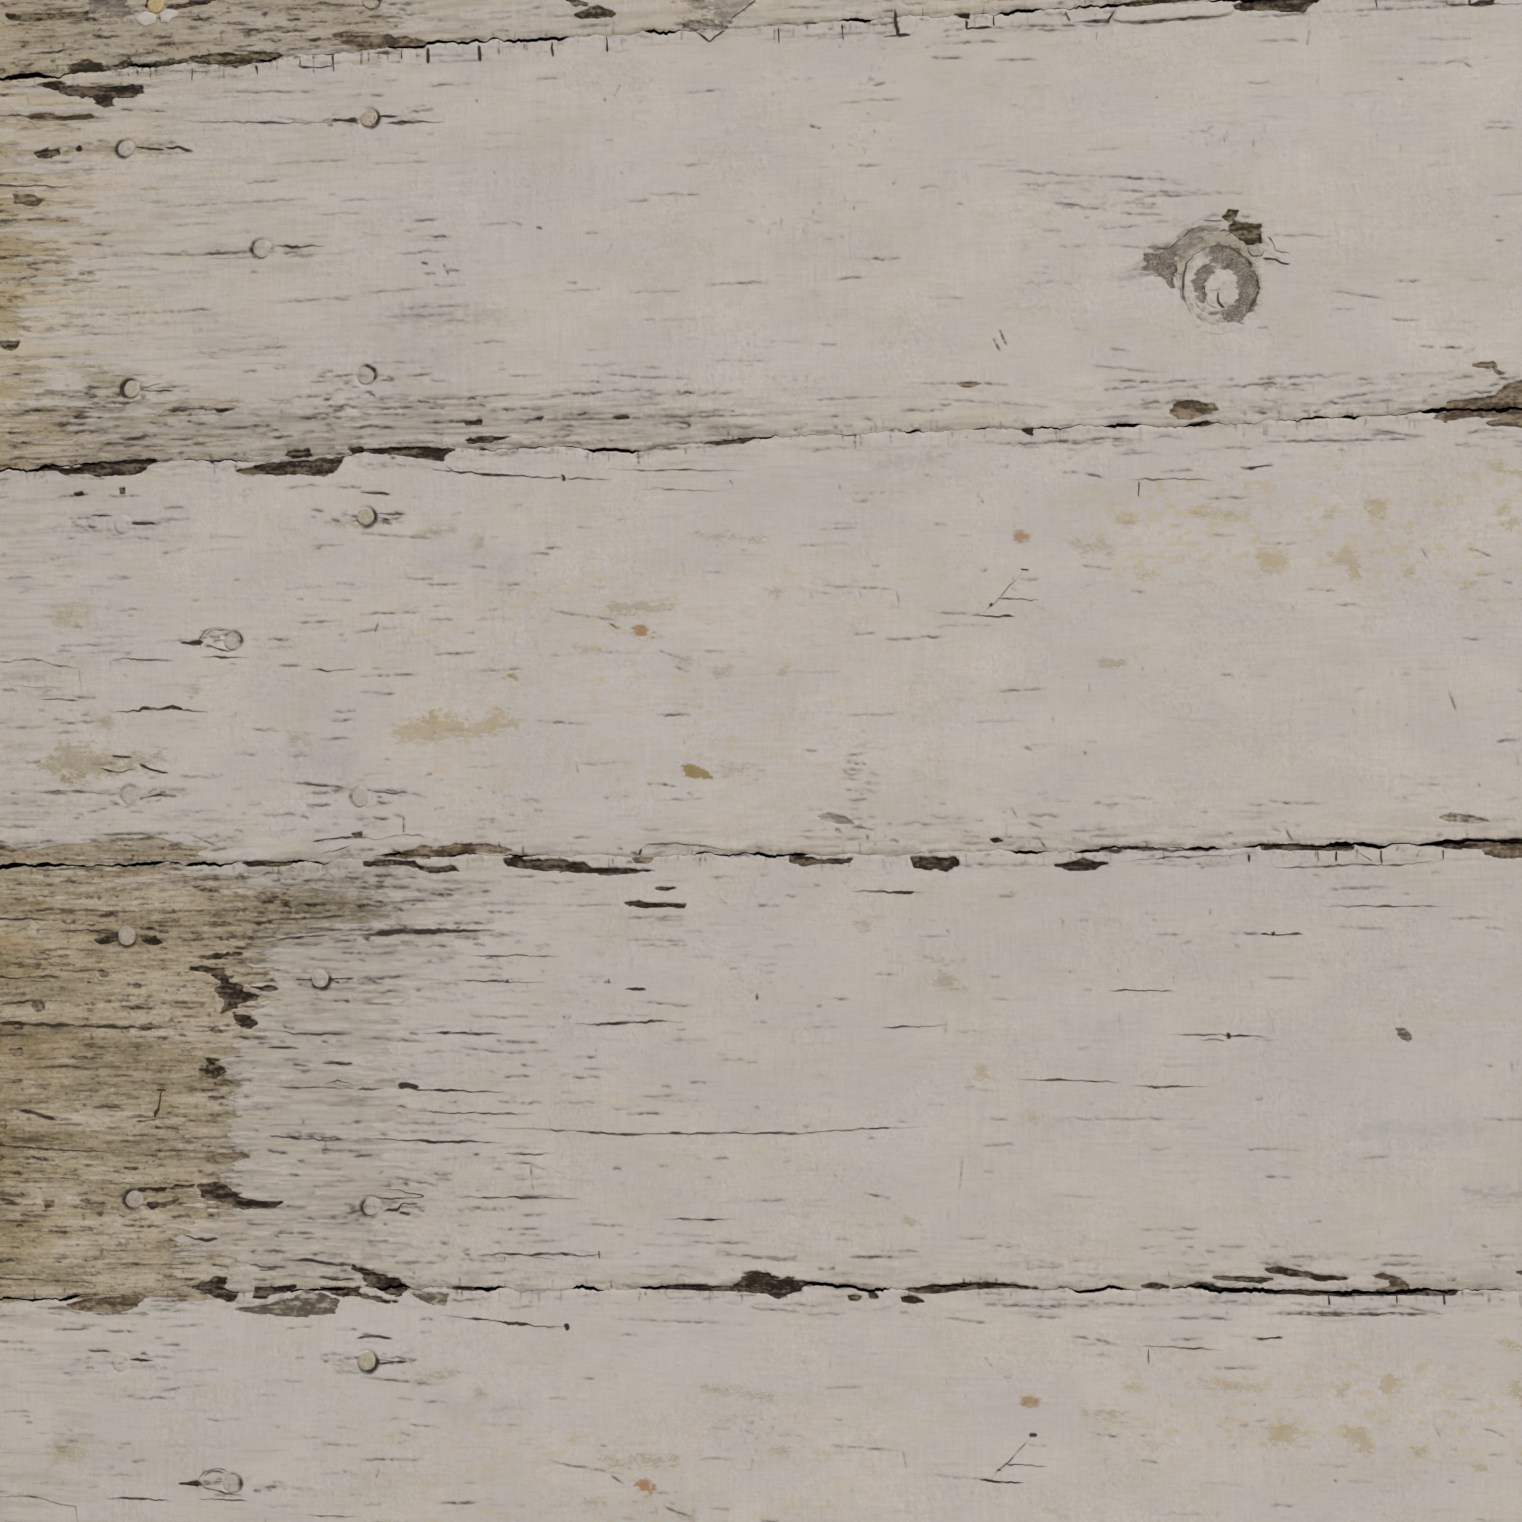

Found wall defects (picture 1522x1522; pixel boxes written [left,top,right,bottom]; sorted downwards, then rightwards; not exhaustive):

peeling [566,0,616,19]
peeling [1113,0,1319,22]
peeling [0,0,509,496]
peeling [1433,361,1522,428]
crack [639,842,721,855]
crack [1107,846,1250,862]
peeling [0,833,686,1317]
crack [258,1258,354,1281]
crack [1259,1295,1398,1339]